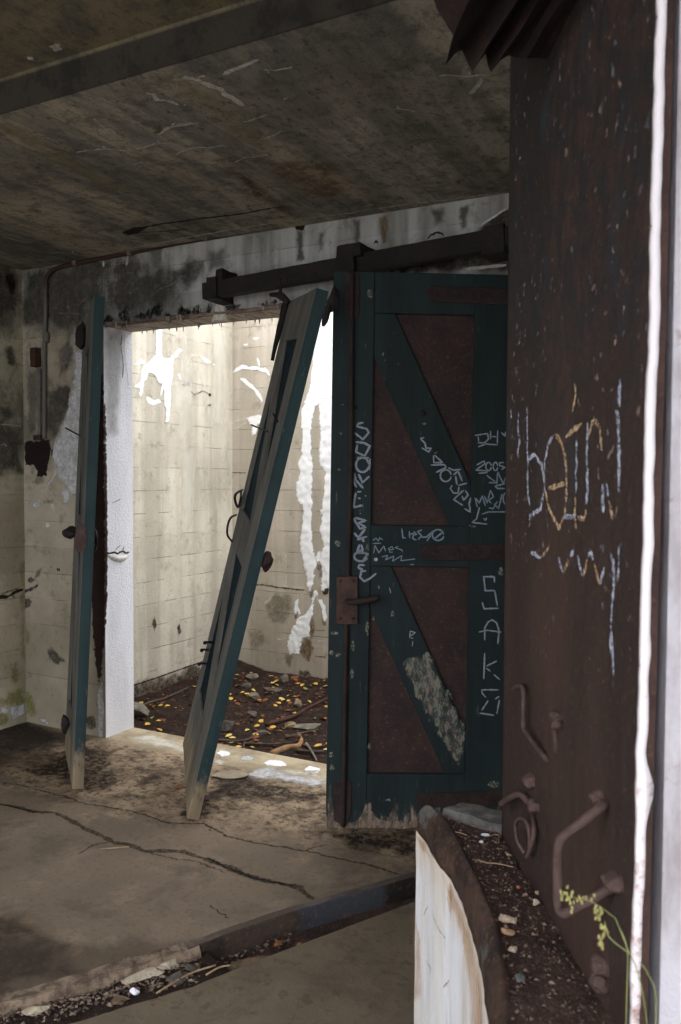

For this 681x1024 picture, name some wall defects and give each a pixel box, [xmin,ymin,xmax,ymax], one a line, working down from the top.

damp [0,372,70,497]
damp [0,192,509,435]
damp [276,312,333,680]
crack [0,782,397,899]